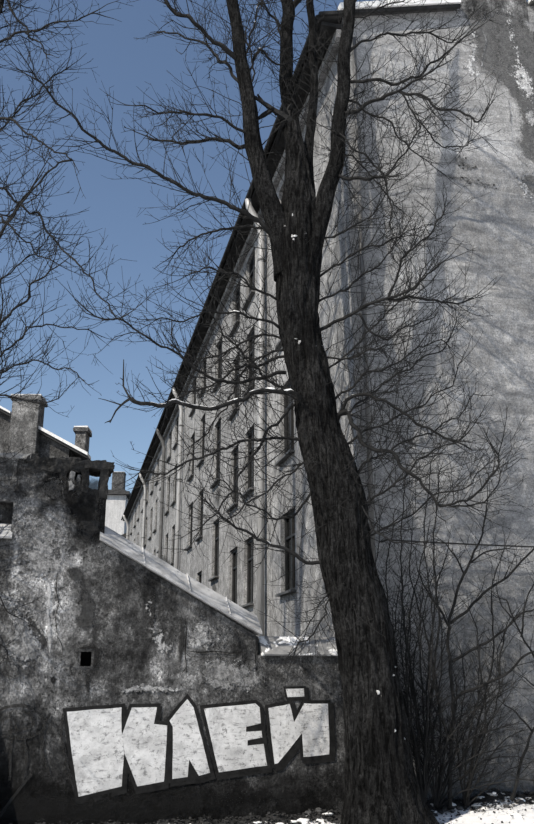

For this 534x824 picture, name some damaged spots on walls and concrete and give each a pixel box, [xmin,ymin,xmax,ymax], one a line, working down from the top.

water stain [471,12,524,78]
spalling [463,6,534,203]